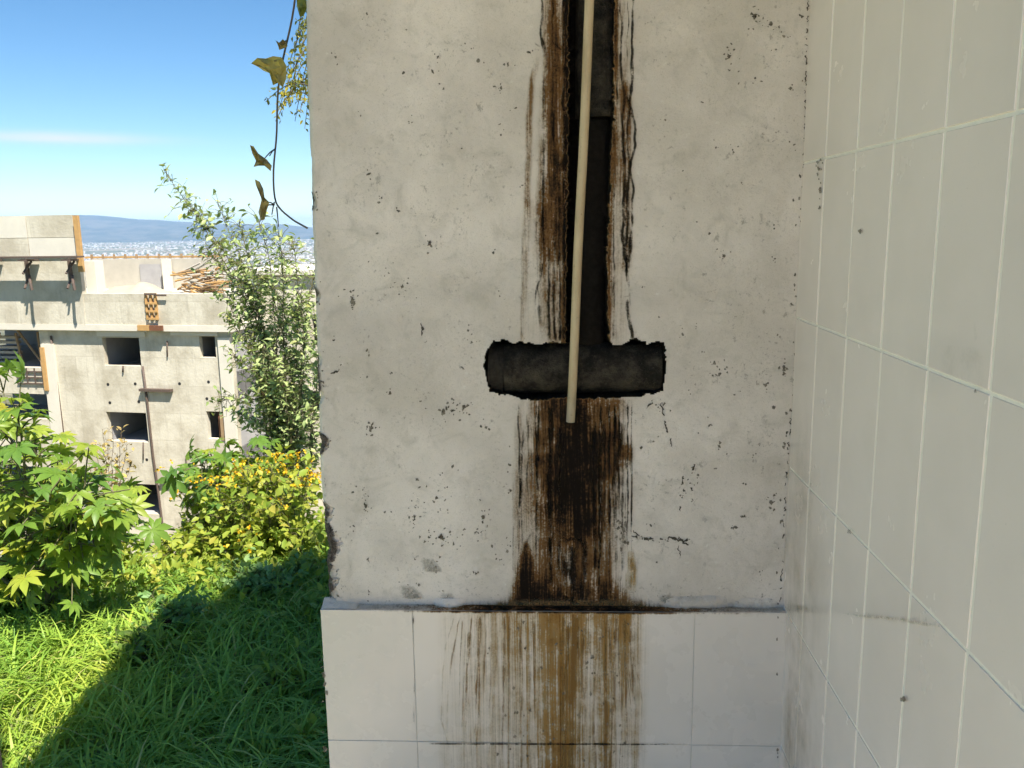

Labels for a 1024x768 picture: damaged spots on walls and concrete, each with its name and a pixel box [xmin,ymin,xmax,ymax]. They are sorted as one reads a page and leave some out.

spalling [319,432,331,455]
spalling [322,500,342,598]
corrosion [451,613,640,768]